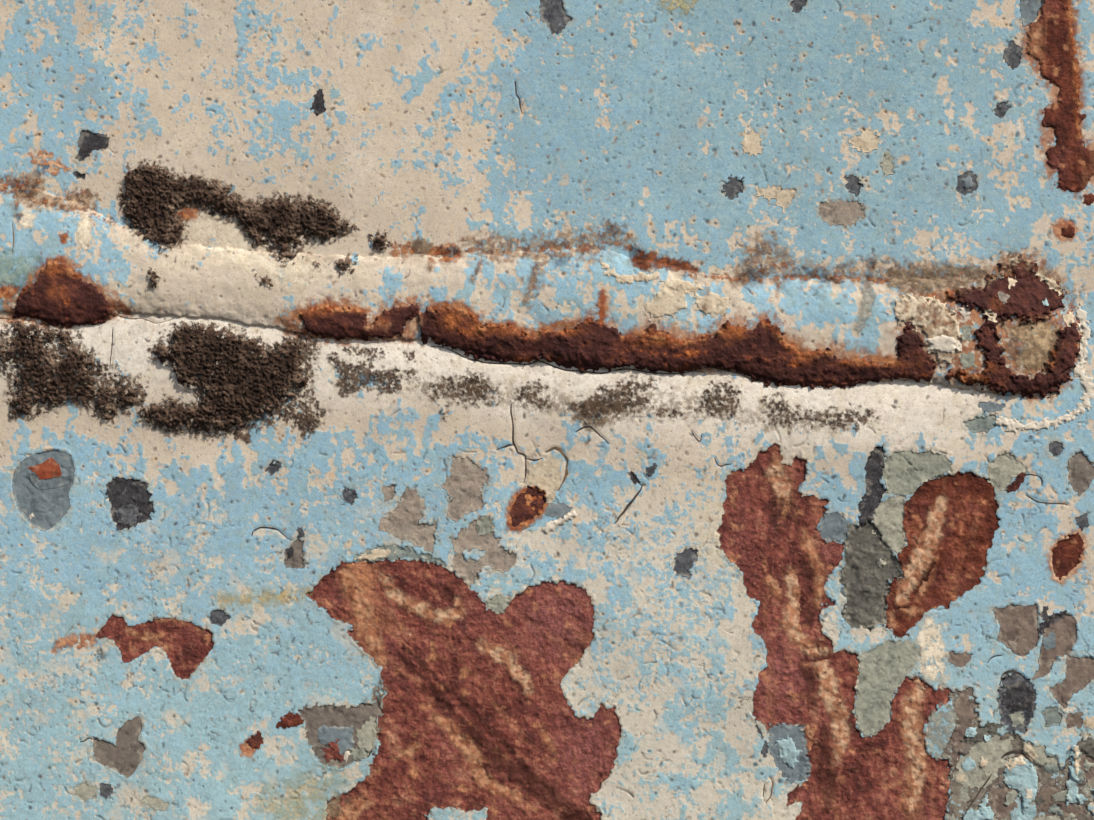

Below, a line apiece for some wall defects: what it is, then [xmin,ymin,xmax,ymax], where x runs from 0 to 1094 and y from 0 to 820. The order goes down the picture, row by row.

corrosion [1022,0,1094,205]
crack [104,314,172,366]
leakage [177,208,318,293]
crack [431,346,755,381]
corrosion [274,219,1083,401]
peeling [12,450,75,531]
peeling [105,477,155,530]
corrosion [223,558,621,820]
corrosion [717,443,952,820]
spalling [819,444,953,632]
corrosion [883,471,1027,638]
peeling [941,604,1094,820]